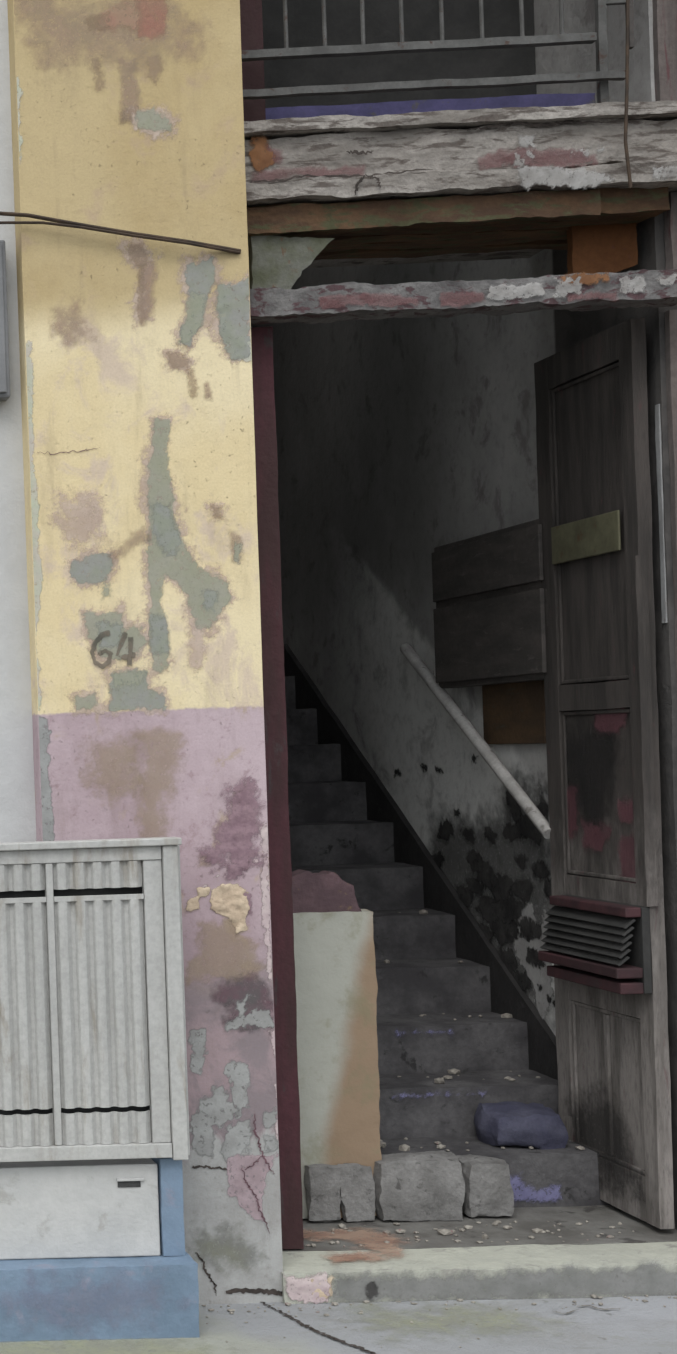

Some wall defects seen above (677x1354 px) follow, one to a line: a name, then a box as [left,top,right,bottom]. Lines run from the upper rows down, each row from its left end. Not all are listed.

peeling [119,59,179,140]
peeling [119,237,159,323]
spalling [162,252,252,373]
peeling [487,272,677,300]
peeling [69,416,235,716]
peeling [232,536,242,562]
peeling [186,776,272,981]
crack [192,1114,274,1234]
peeling [189,1061,279,1221]
crack [195,1252,376,1354]
crack [556,1305,620,1314]